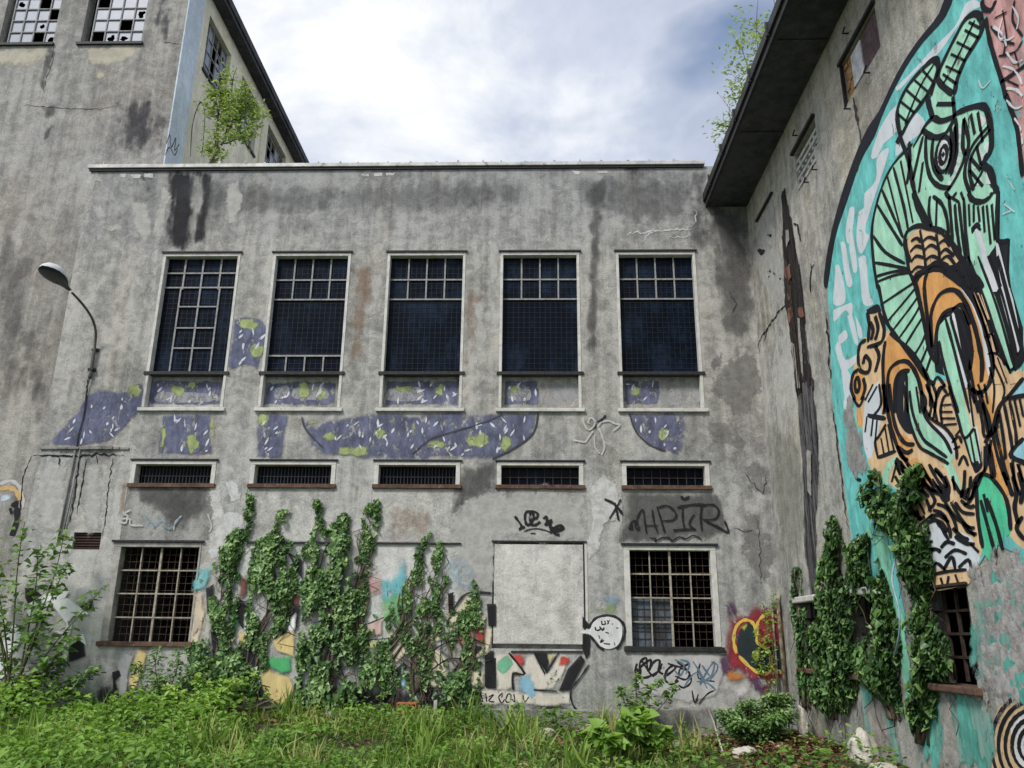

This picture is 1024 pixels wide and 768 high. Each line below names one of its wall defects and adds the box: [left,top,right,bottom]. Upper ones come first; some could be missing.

crack [25,49,118,110]
water stain [126,101,164,149]
water stain [74,171,211,309]
water stain [226,181,243,225]
water stain [591,182,605,278]
crack [627,210,697,240]
water stain [588,293,596,346]
crack [19,379,124,536]
water stain [140,487,203,522]
peeling [967,546,1024,724]